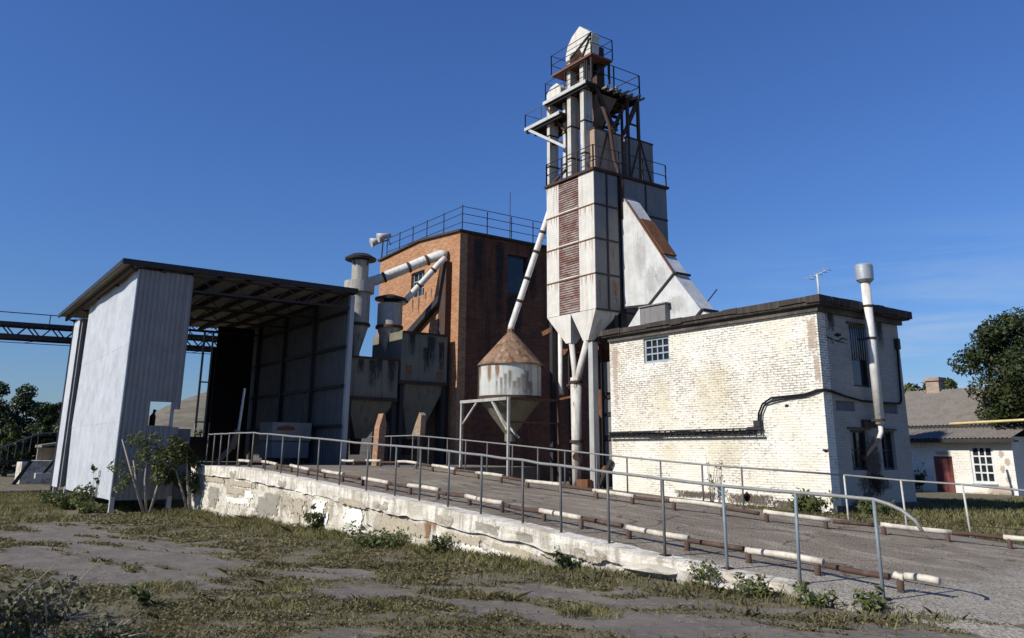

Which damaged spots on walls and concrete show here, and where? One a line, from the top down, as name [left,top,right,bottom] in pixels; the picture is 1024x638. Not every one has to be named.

damp [410,333,444,371]
peeling [201,471,559,566]